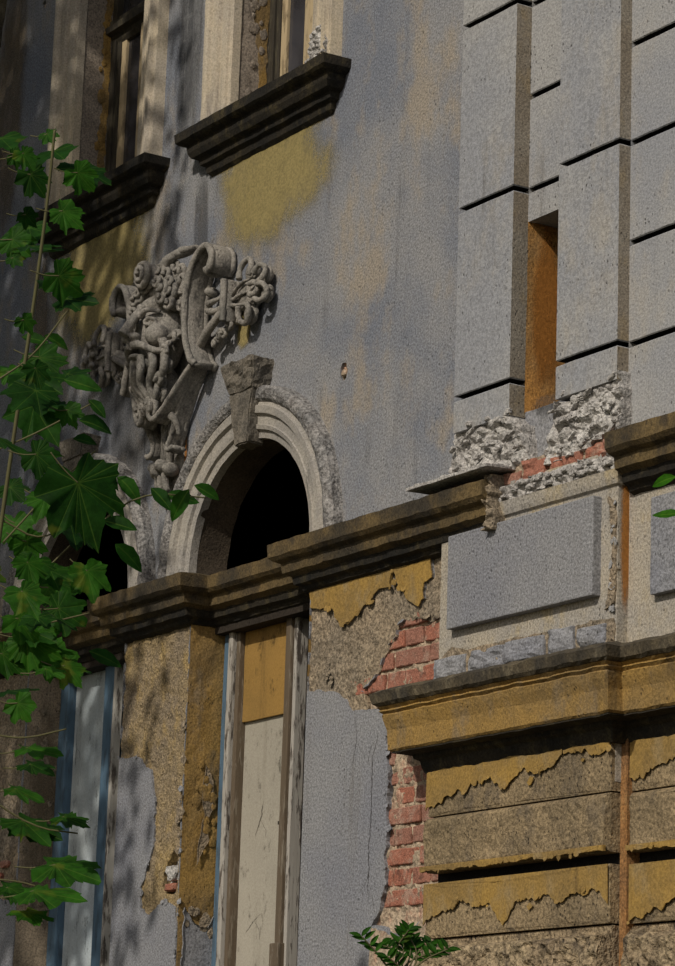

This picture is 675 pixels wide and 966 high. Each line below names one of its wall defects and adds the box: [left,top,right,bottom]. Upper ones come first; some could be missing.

spalling [448,370,632,503]
peeling [309,496,621,711]
peeling [117,627,217,966]
flaking render [377,742,612,936]
peeling [625,839,675,852]
peeling [626,859,675,925]
peeling [629,734,675,781]